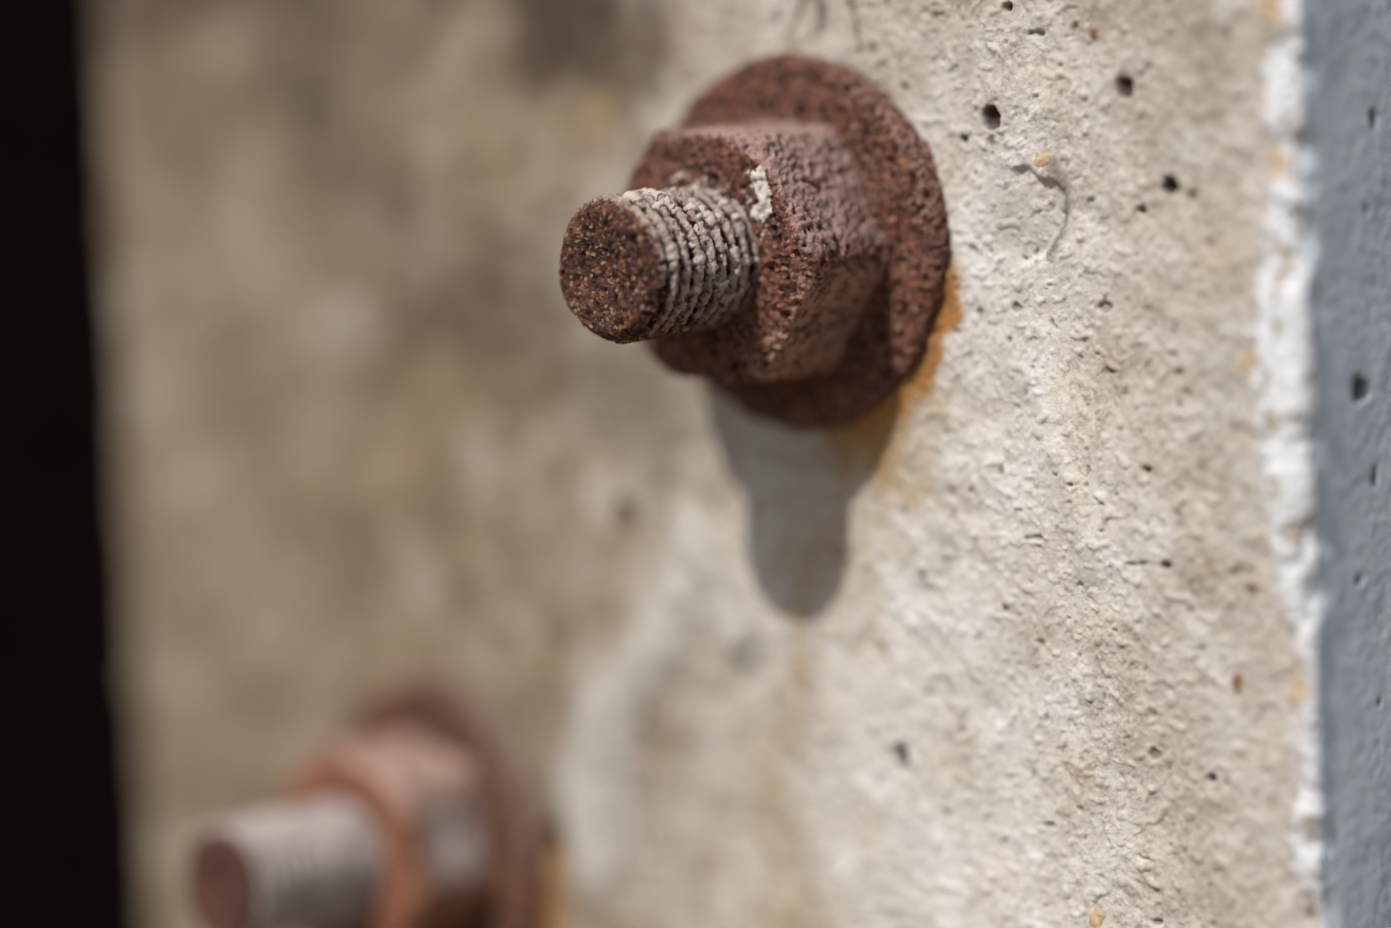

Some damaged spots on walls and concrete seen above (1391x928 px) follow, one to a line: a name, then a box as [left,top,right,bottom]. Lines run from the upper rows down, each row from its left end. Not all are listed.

rust [830,258,962,488]